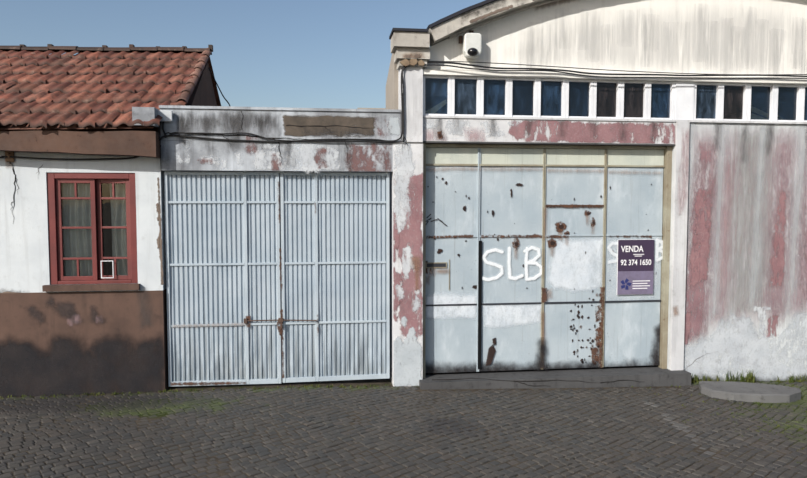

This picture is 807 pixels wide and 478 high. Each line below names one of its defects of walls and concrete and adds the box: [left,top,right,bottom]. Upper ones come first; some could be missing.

peeling [425,118,687,152]
crack [9,162,19,222]
peeling [156,177,164,285]
peeling [236,115,447,387]
corrosion [426,221,570,250]
corrosion [546,204,602,227]
water stain [0,337,164,398]
corrosion [276,309,284,378]
corrosion [425,287,660,373]